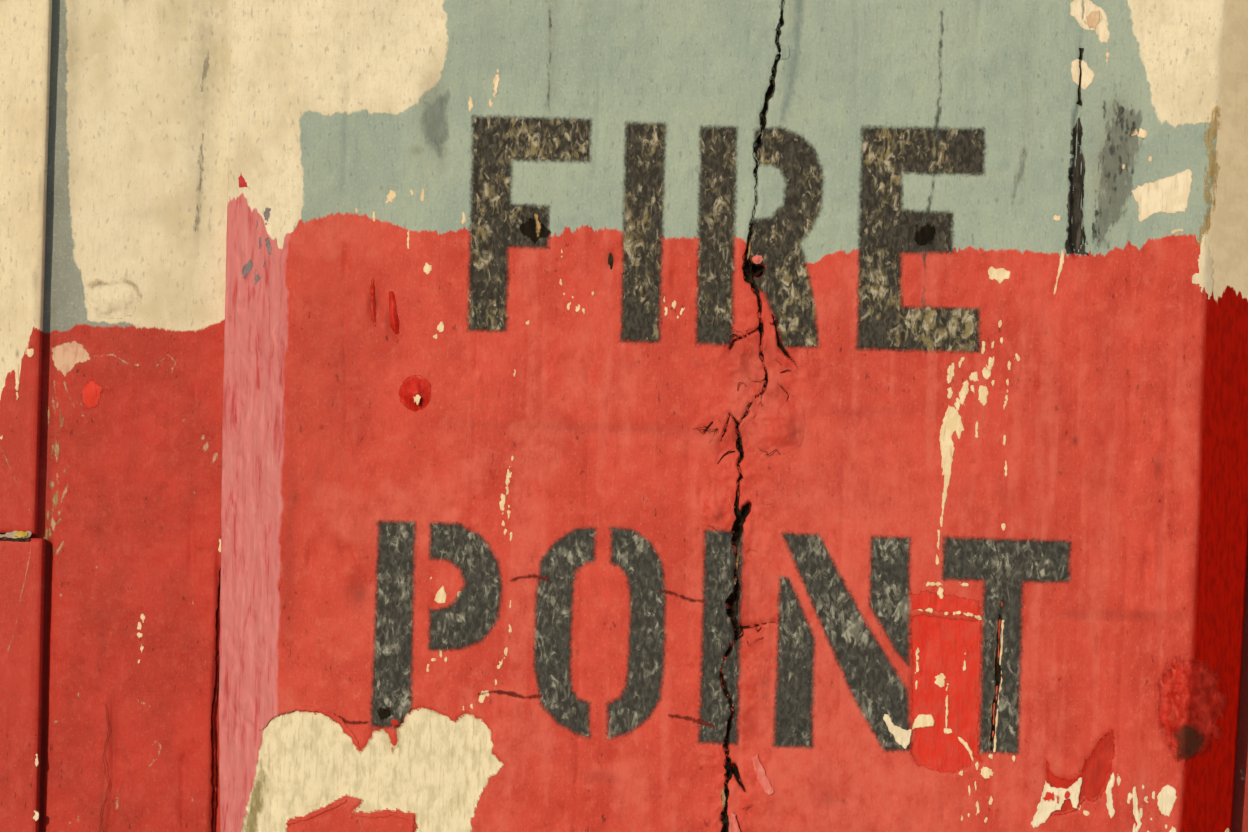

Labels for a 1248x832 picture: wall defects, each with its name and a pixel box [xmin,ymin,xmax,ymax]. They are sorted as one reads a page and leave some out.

peeling [499,456,514,541]
crack [661,0,798,832]
peeling [936,320,1020,565]
peeling [241,648,508,832]
peeling [883,582,993,823]
peeling [1031,729,1177,832]